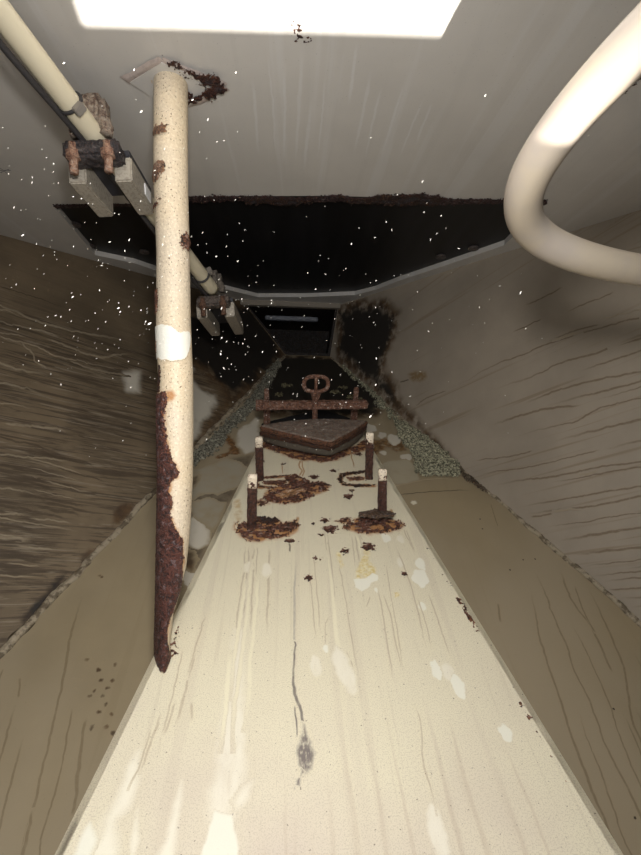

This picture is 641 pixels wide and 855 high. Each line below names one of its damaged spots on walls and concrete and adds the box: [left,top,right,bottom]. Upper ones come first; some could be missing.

corrosion [110,500,137,529]
corrosion [150,364,186,673]
corrosion [230,437,409,552]
corrosion [18,571,70,625]